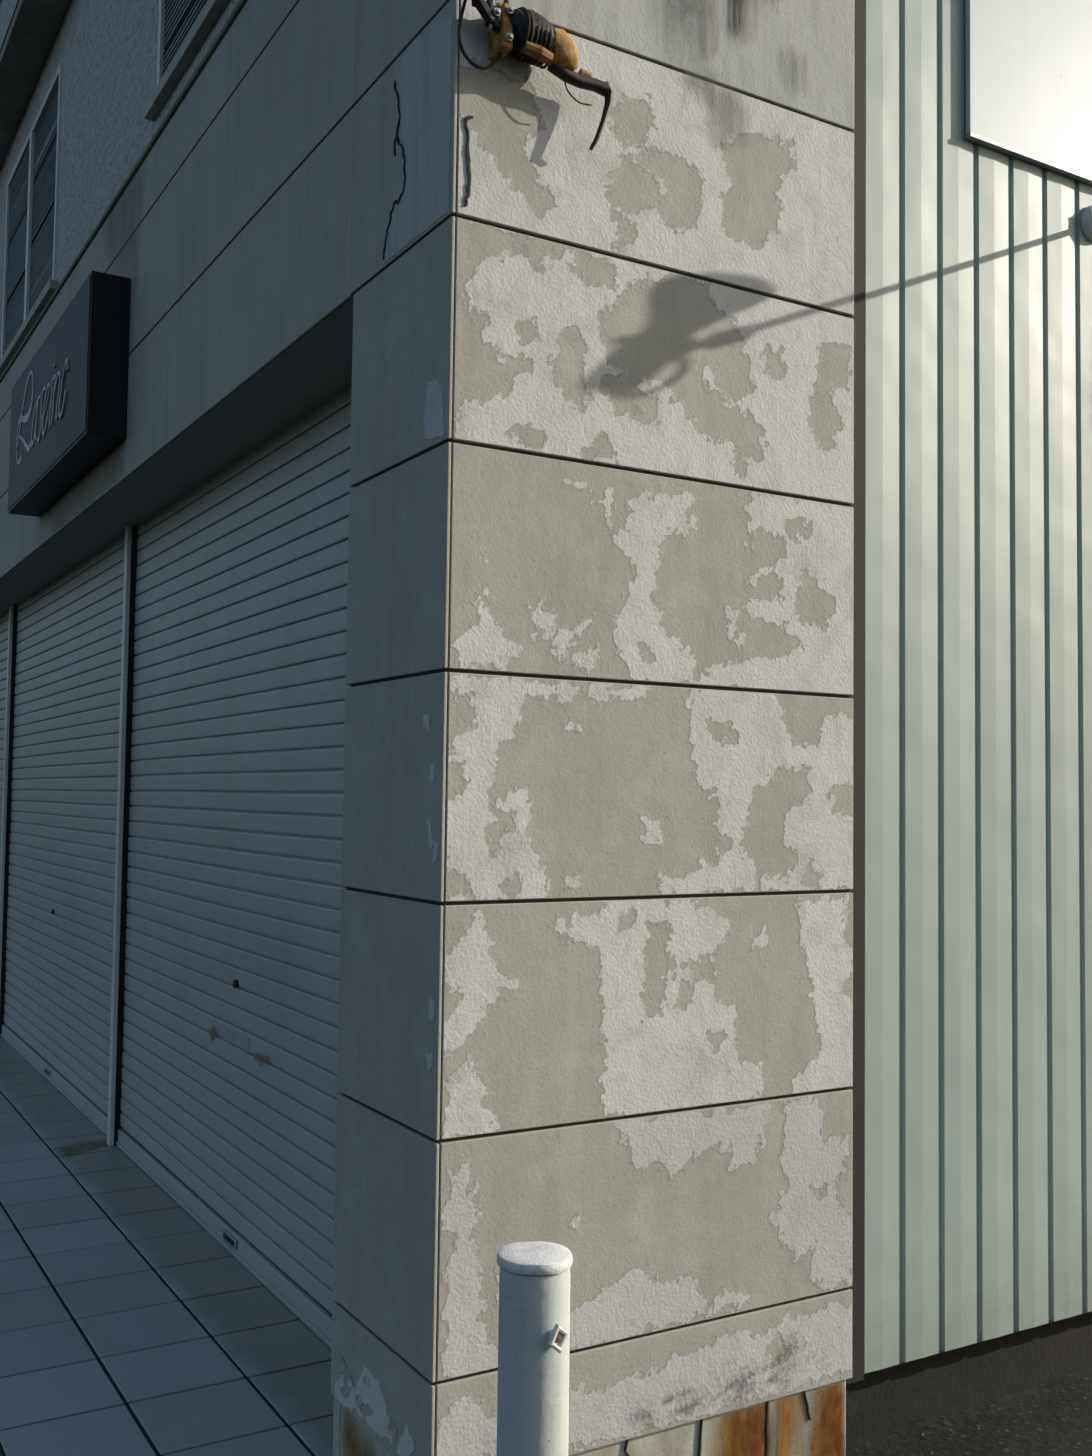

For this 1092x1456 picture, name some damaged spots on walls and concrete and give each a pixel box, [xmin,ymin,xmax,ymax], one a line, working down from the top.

crack [383,80,406,260]
crack [464,116,474,207]
peeling [384,0,854,1456]
spalling [334,1356,415,1456]
water stain [670,1336,814,1413]
rust [722,1384,846,1456]